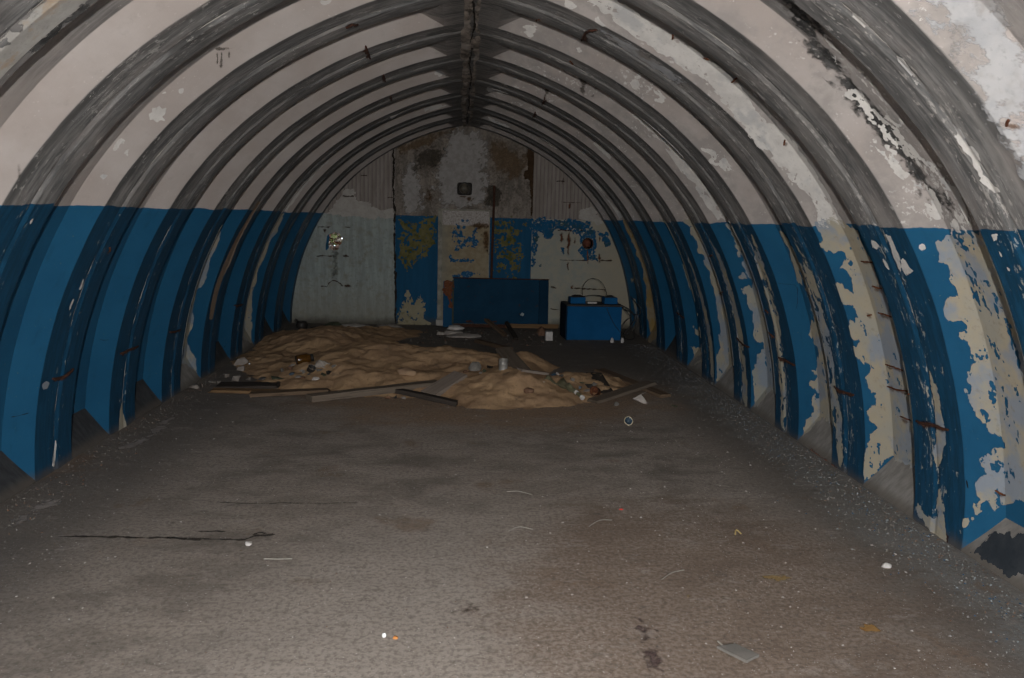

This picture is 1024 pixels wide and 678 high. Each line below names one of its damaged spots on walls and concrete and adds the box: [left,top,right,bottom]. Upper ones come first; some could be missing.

crack [466,0,476,124]
peeling [397,290,431,325]
damp [397,127,502,272]
peeling [449,219,480,280]
peeling [564,0,949,542]
peeling [844,67,1024,528]